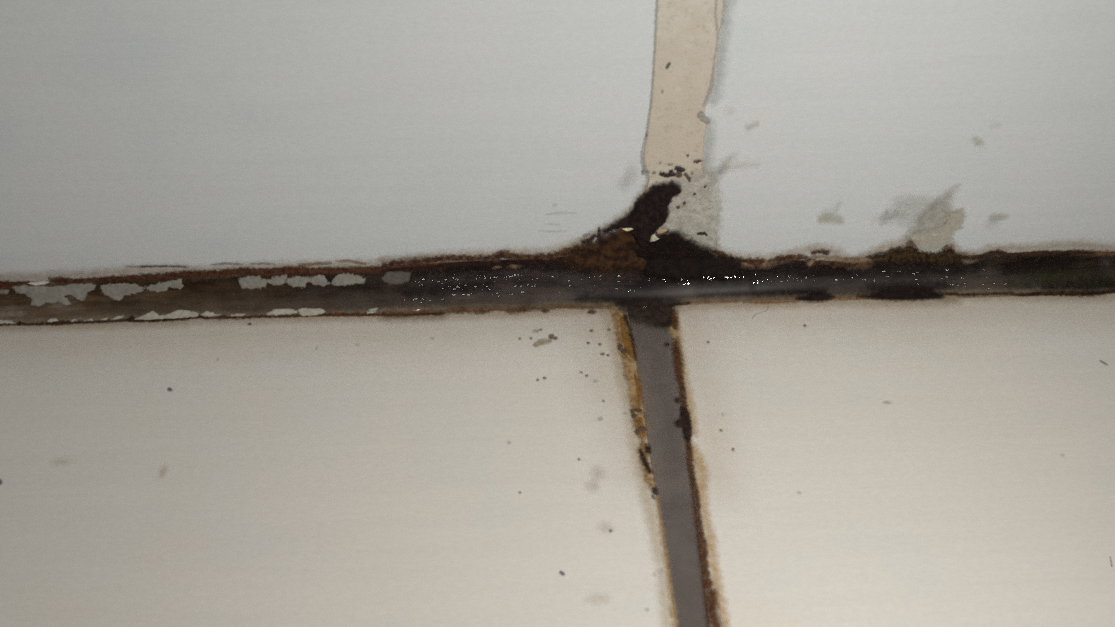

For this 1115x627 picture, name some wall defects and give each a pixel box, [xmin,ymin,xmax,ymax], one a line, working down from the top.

peeling [0,279,183,306]
peeling [238,273,365,289]
peeling [381,271,411,284]
damp [578,244,1115,327]
peeling [48,310,245,322]
peeling [266,308,325,316]